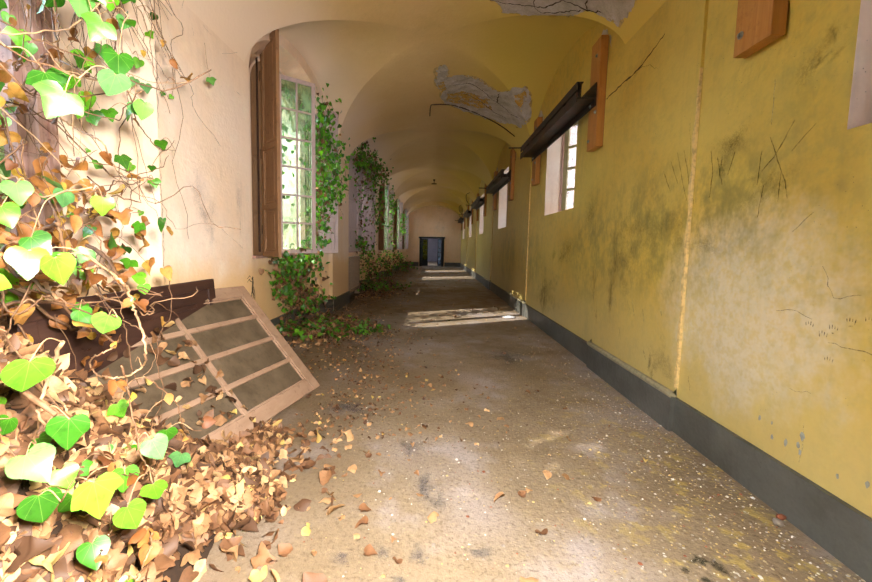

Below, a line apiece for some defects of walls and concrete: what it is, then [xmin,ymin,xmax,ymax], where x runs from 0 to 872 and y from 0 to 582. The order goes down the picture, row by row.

flaking render [490,0,637,44]
flaking render [433,65,544,128]
crack [607,34,665,99]